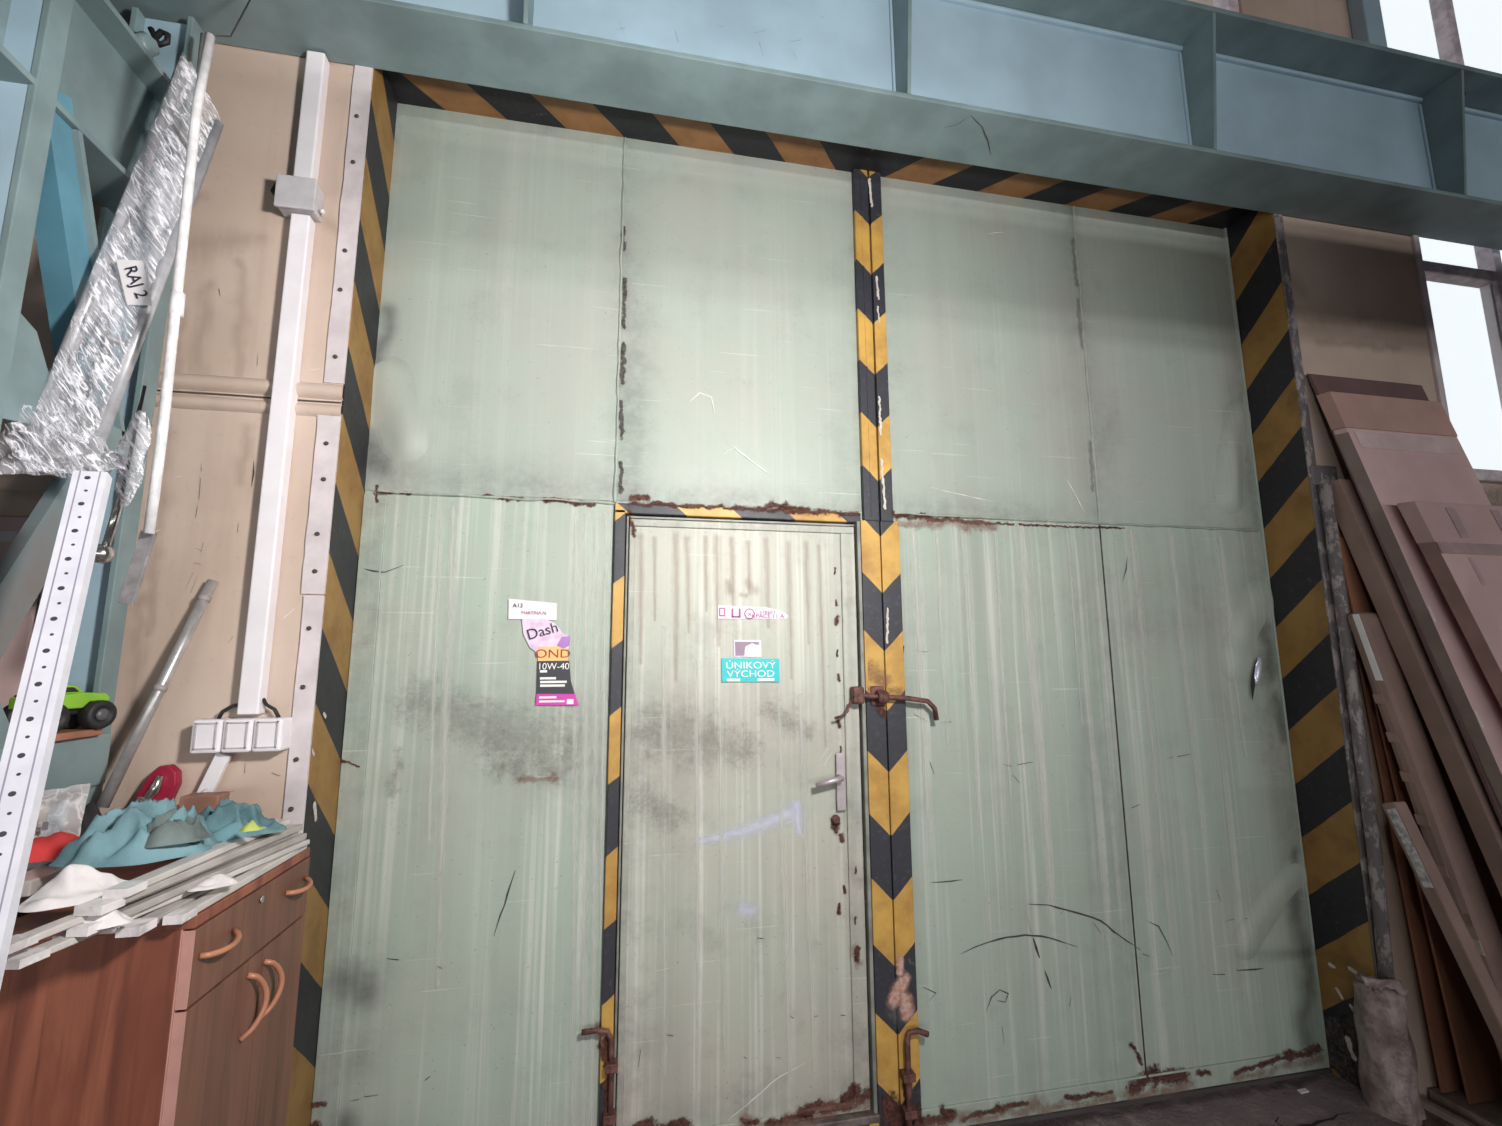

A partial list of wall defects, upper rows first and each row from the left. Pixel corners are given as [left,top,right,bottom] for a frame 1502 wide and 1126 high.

rust [628,494,861,537]
rust [892,511,1125,530]
rust [598,1037,614,1126]
rust [1056,1043,1211,1108]
rust [1234,1044,1322,1078]
rust [633,1116,692,1126]
rust [740,1082,1038,1126]
crack [1275,1112,1350,1126]